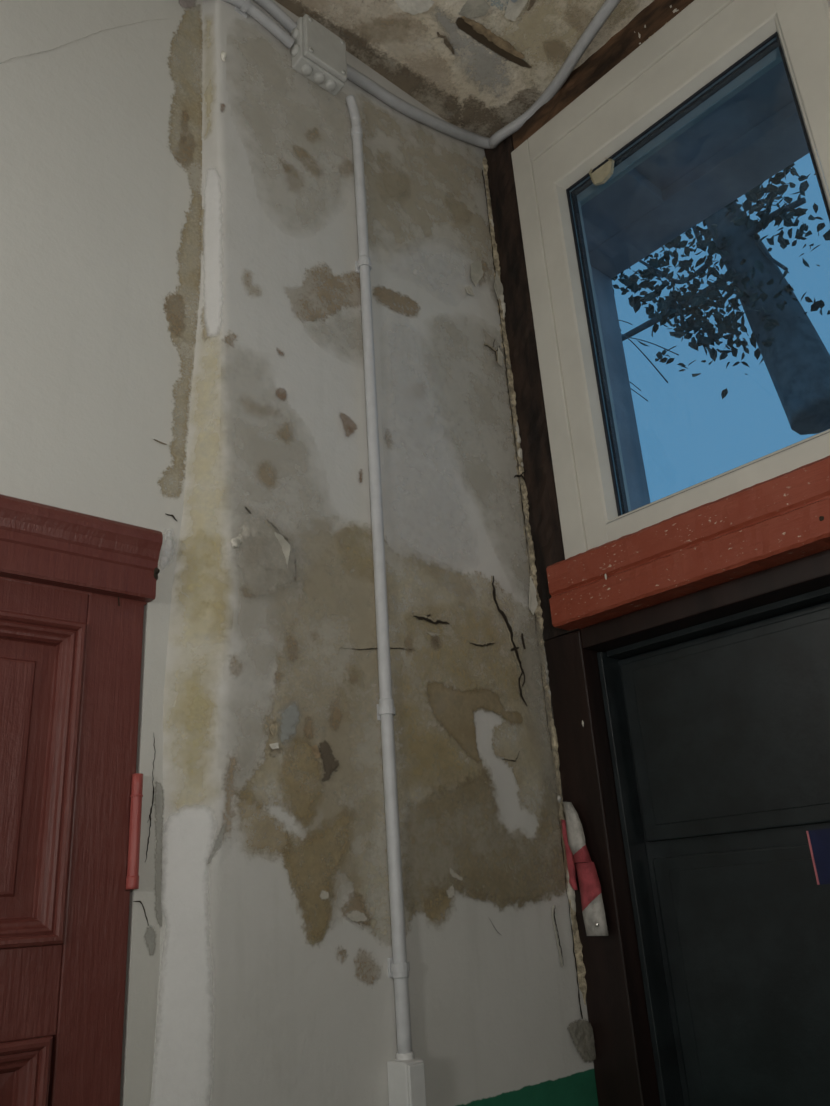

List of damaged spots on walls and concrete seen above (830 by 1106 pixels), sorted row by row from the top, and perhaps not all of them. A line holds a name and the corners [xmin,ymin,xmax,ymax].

water stain [168,10,212,170]
flaking render [395,0,435,15]
flaking render [456,0,531,68]
water stain [362,103,491,257]
water stain [297,265,360,321]
water stain [373,287,420,317]
water stain [158,185,224,644]
water stain [170,669,211,810]
flaking render [311,740,339,782]
water stain [223,421,567,945]
crack [413,613,449,624]
crack [469,576,527,706]